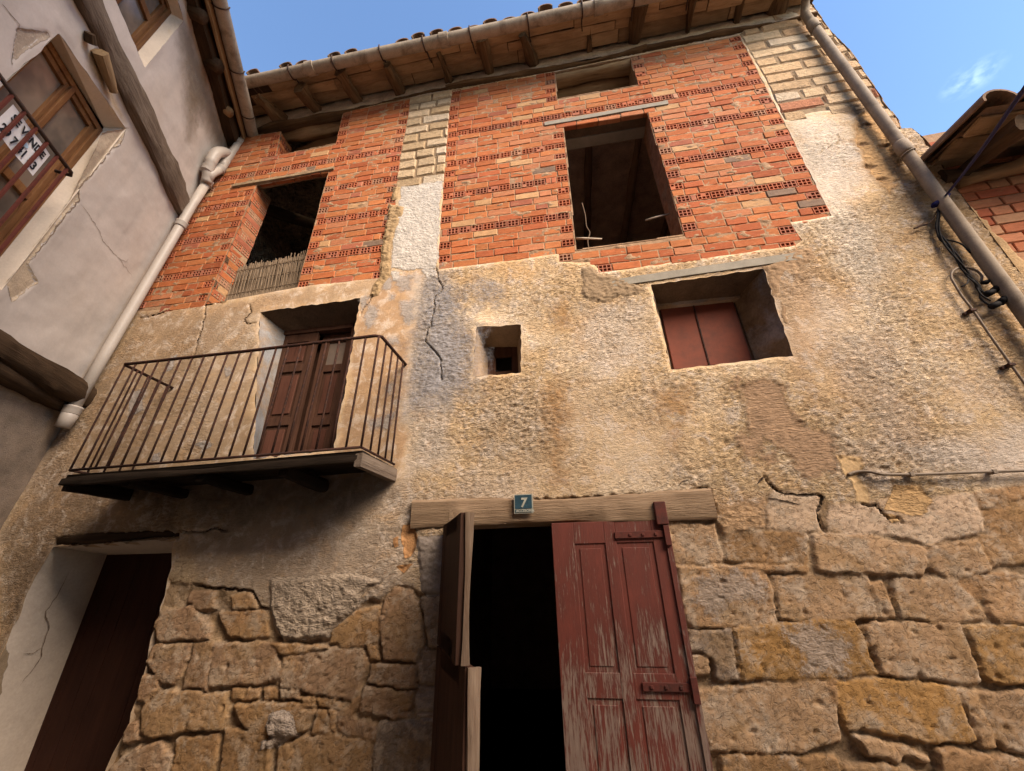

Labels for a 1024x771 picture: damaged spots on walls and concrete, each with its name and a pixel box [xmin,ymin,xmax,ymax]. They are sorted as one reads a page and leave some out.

crack [757,477,824,532]
spalling [882,485,932,523]
spalling [393,524,418,573]
crack [23,573,69,681]